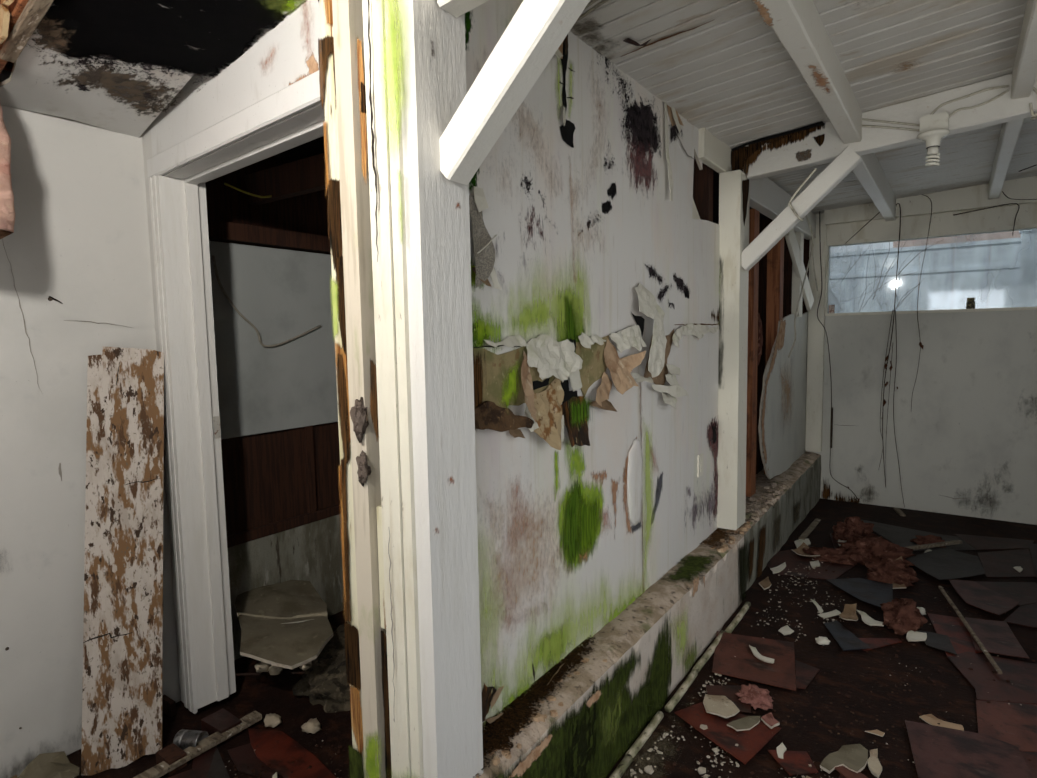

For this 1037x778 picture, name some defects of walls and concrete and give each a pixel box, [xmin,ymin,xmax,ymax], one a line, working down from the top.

water stain [26,0,297,117]
water stain [573,21,661,236]
peeling [484,335,529,348]
water stain [520,273,584,331]
water stain [510,396,663,582]
spalling [587,690,602,708]
water stain [646,618,672,715]
spalling [509,734,553,778]